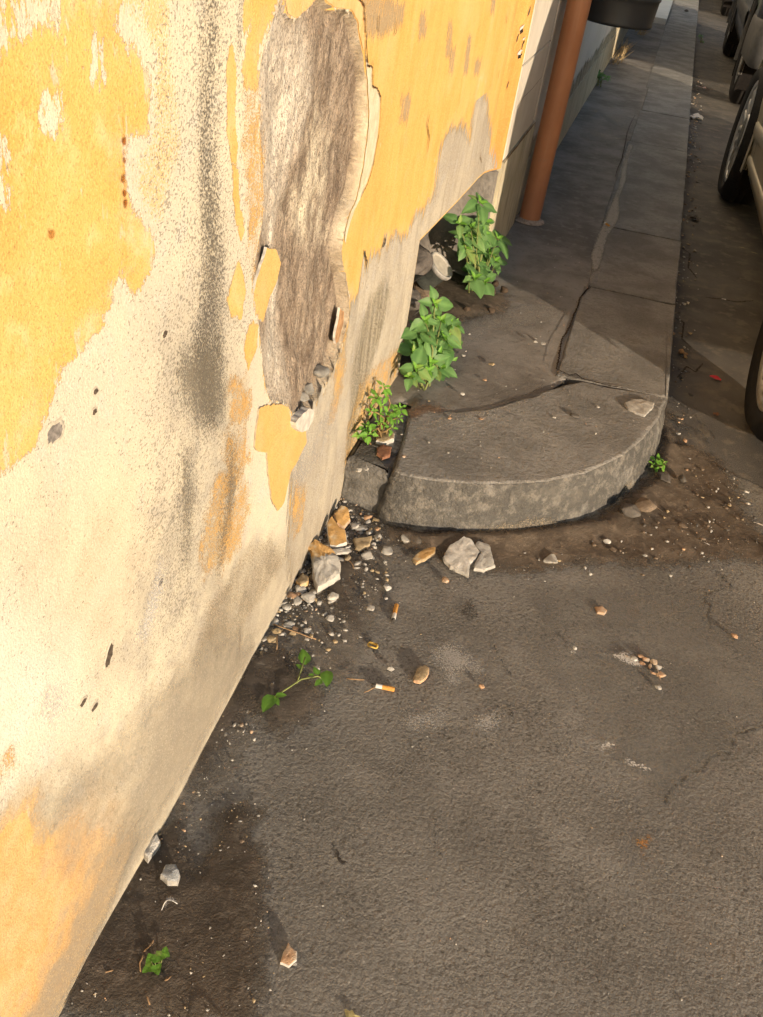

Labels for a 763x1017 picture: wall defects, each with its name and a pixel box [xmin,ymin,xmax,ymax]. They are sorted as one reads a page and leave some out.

damp [64,801,270,1017]
peeling [0,0,497,985]